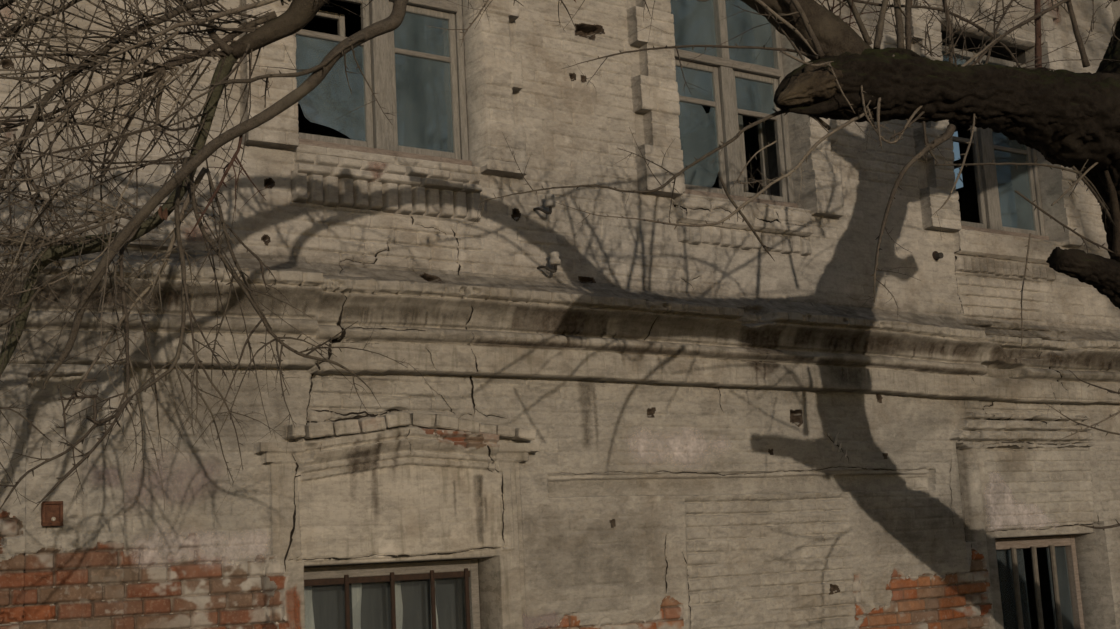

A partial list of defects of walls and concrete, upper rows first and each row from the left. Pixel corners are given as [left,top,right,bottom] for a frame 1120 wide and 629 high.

crack [284,243,505,572]
peeling [416,426,486,451]
peeling [0,510,289,629]
peeling [533,596,685,629]
peeling [853,549,992,629]